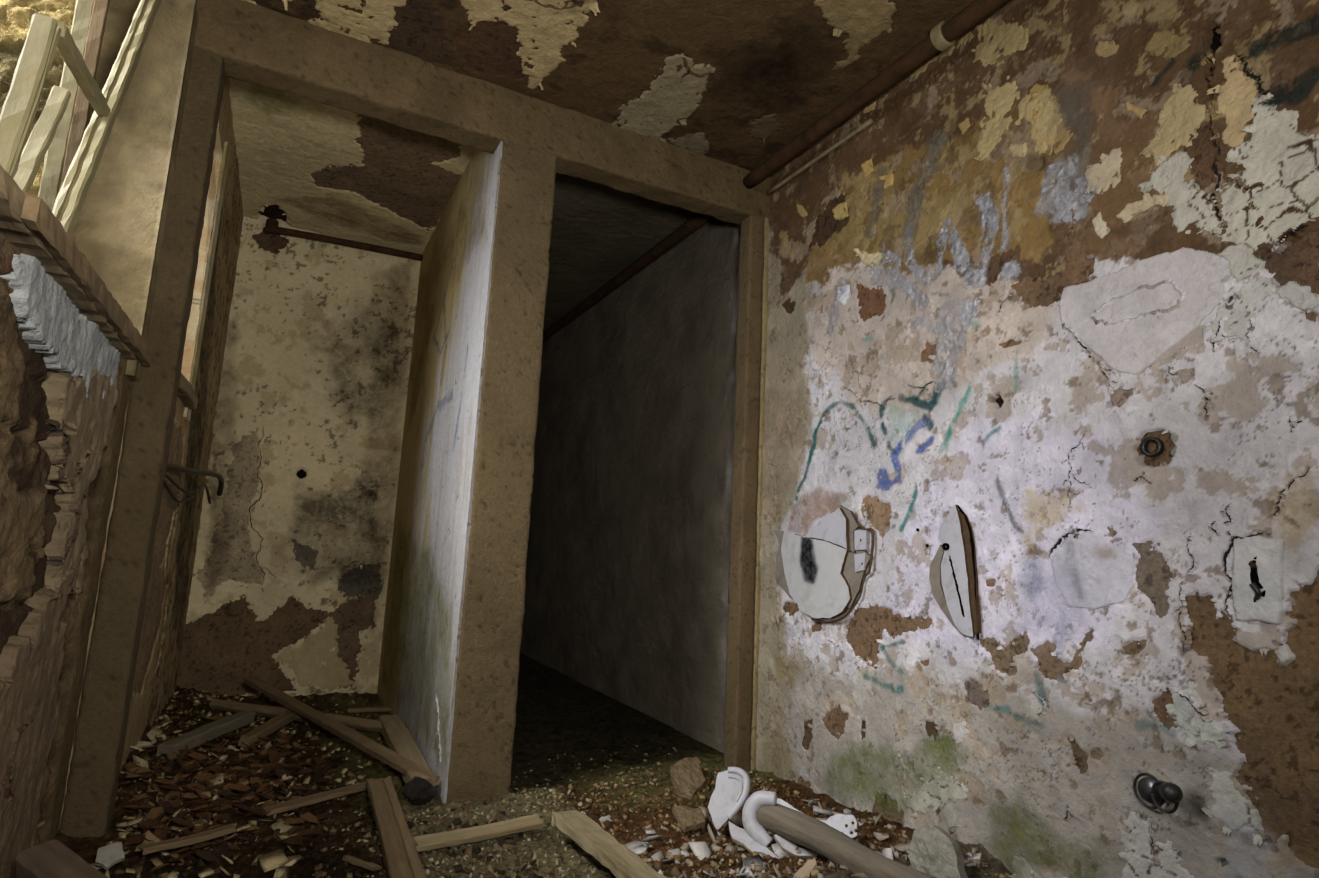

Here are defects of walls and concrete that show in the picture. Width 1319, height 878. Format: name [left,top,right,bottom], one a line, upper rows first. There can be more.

flaking render [282,0,456,68]
flaking render [310,114,464,231]
peeling [459,0,600,90]
crack [502,0,581,10]
peeling [612,53,716,156]
peeling [910,18,1074,161]
peeling [984,26,1319,343]
crack [1186,49,1310,248]
flaking render [177,427,385,696]
flaking render [845,604,932,669]
flaking render [975,608,1093,684]
flaking render [1132,540,1319,876]